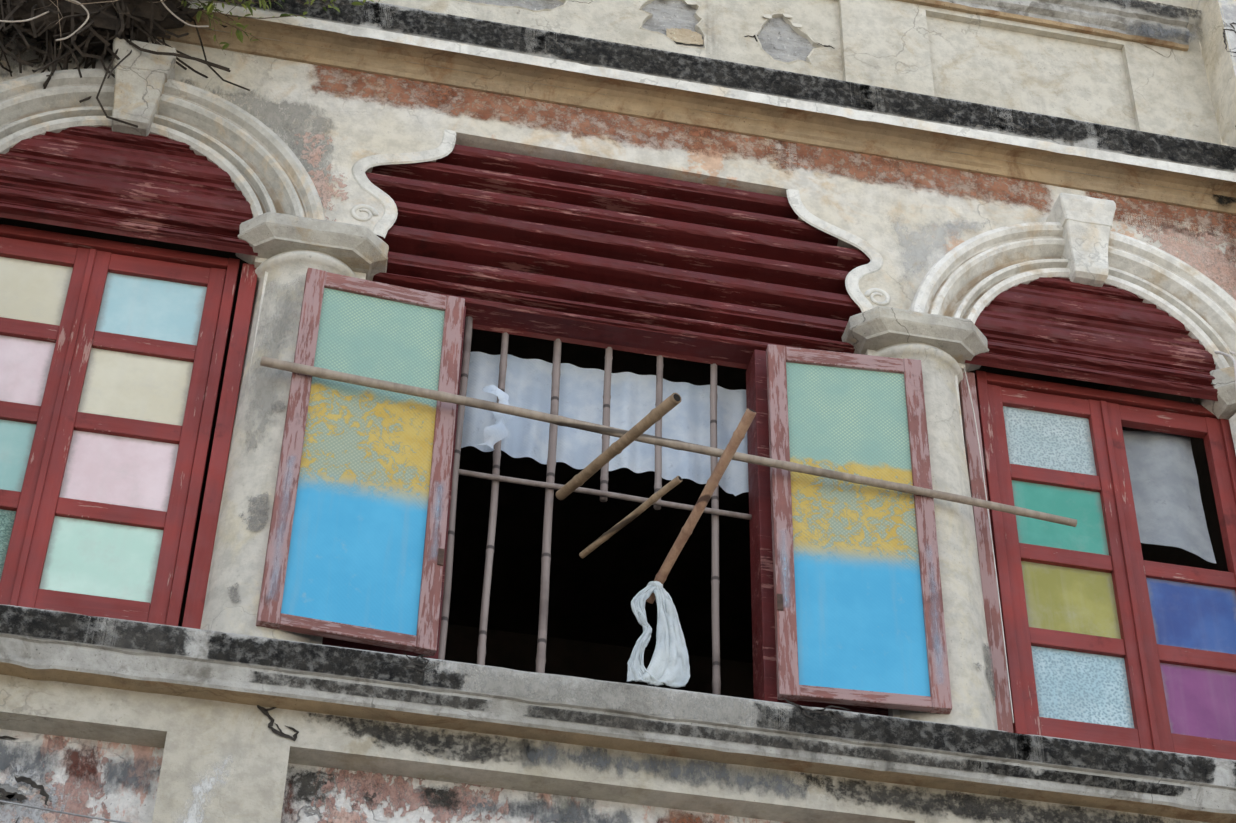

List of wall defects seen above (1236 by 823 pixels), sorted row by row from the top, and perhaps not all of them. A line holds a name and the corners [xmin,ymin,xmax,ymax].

flaking render [458,0,567,12]
flaking render [638,0,706,49]
flaking render [744,13,835,65]
damp [218,0,1236,171]
damp [0,605,187,655]
crack [257,705,299,741]
damp [207,632,1216,796]
peeling [0,765,68,823]
peeling [311,798,368,823]
damp [281,713,1180,823]